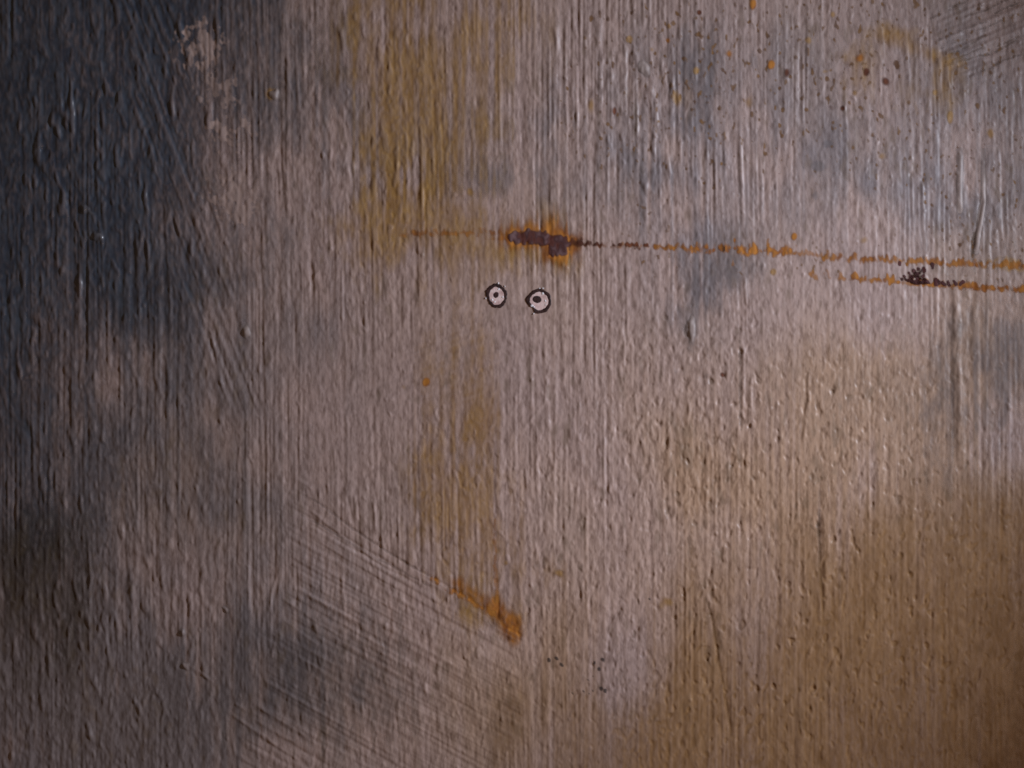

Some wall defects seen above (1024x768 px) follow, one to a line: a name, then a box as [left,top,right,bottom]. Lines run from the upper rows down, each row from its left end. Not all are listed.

rust [491,219,797,265]
rust [838,243,1024,292]
rust [450,579,521,643]